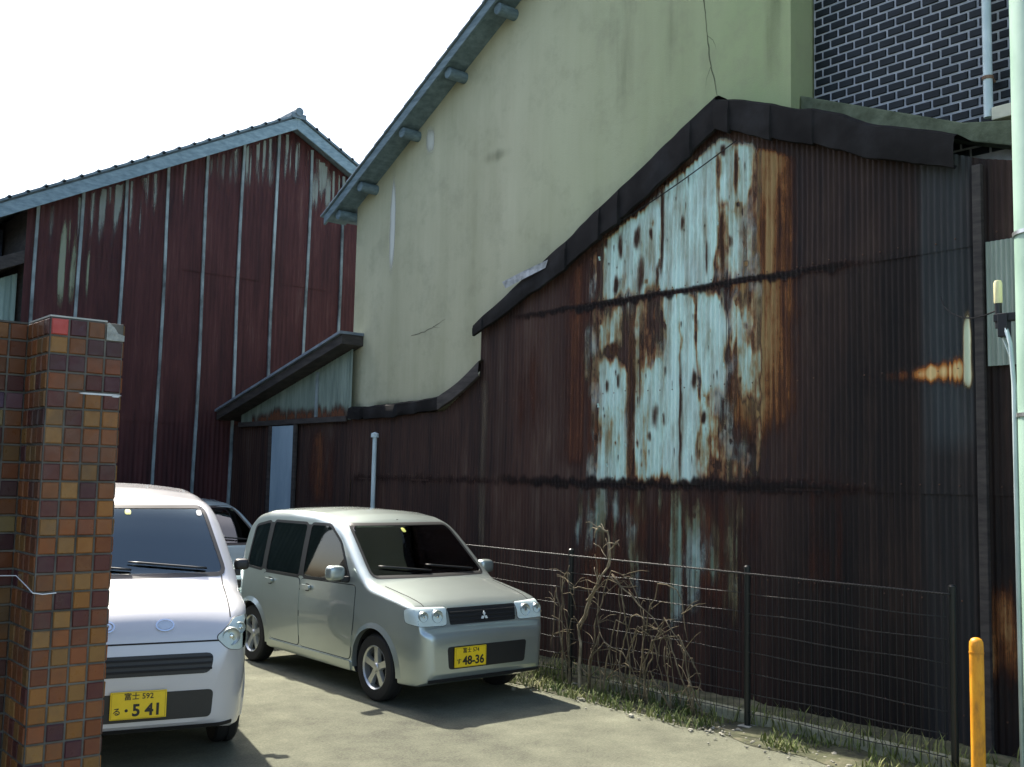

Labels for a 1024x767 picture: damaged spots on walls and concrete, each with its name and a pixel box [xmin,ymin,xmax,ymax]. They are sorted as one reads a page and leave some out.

crack [703,0,717,94]
rust [353,363,858,608]
peeling [576,137,762,623]
rust [518,145,851,465]
rust [913,358,963,383]
rust [992,592,1023,679]